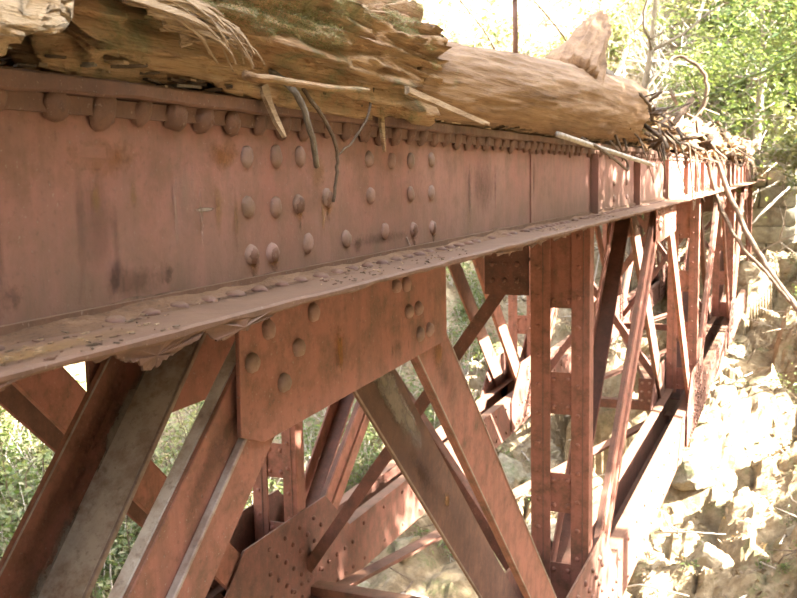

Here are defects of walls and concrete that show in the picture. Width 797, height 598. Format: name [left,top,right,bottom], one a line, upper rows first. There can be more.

rust [495,233,571,256]
rust [92,311,274,371]